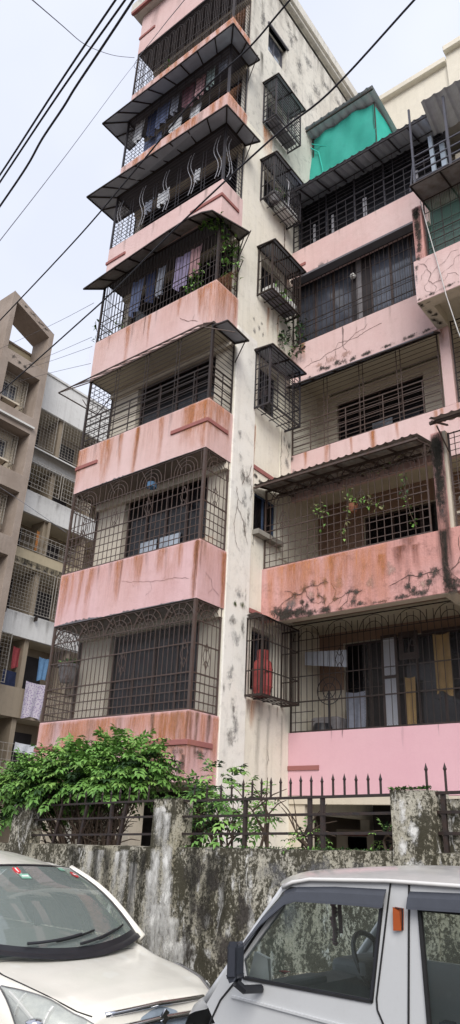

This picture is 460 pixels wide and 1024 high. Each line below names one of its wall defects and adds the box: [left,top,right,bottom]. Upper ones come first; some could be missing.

crack [309,323,381,365]
water stain [378,434,460,602]
water stain [271,578,365,620]
water stain [92,848,110,884]
water stain [128,852,146,910]
water stain [174,851,253,969]